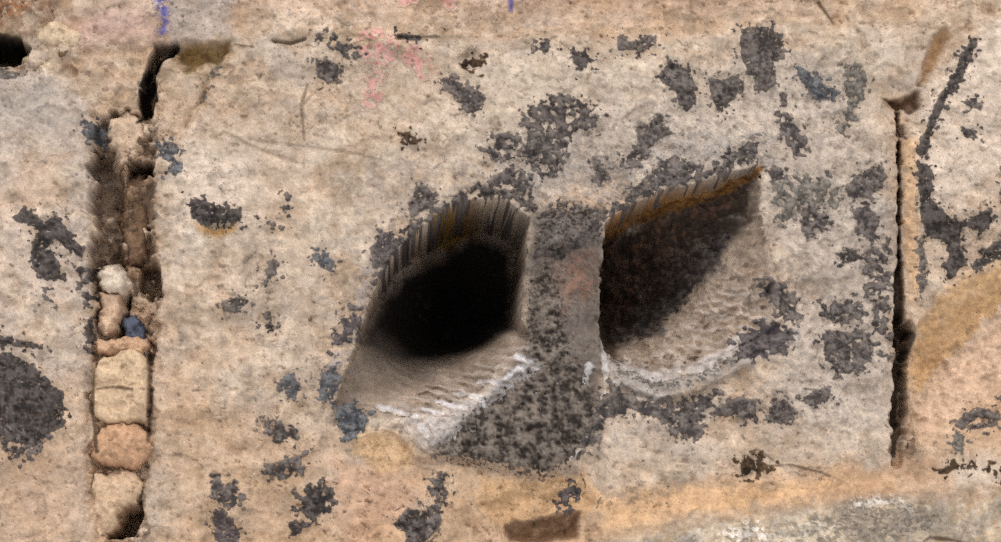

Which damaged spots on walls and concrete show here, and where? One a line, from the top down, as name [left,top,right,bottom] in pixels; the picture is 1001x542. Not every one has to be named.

crack [135,44,181,125]
crack [889,113,919,459]